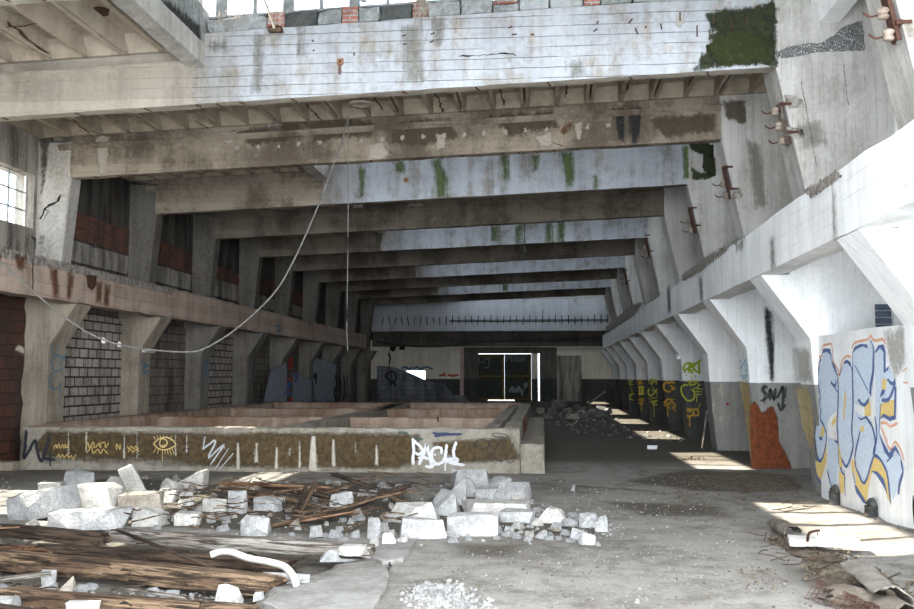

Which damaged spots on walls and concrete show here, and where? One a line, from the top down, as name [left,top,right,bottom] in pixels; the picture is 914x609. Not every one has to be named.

crack [461,50,516,58]
crack [39,194,61,220]
corrosion [50,268,73,298]
corrosion [86,274,110,306]